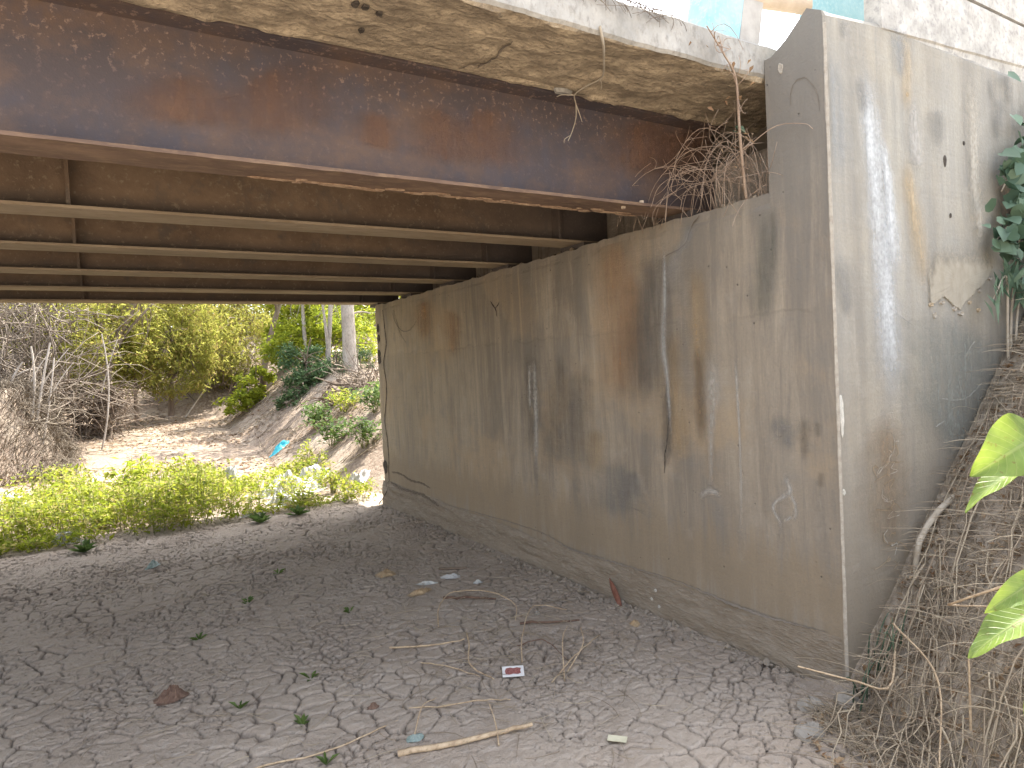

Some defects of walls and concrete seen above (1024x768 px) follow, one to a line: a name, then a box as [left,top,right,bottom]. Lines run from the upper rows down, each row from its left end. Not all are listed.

crack [459,41,513,69]
rust [247,176,635,216]
efflorescence [865,98,898,364]
peeling [929,256,993,319]
crack [378,310,439,506]
crack [662,376,670,473]